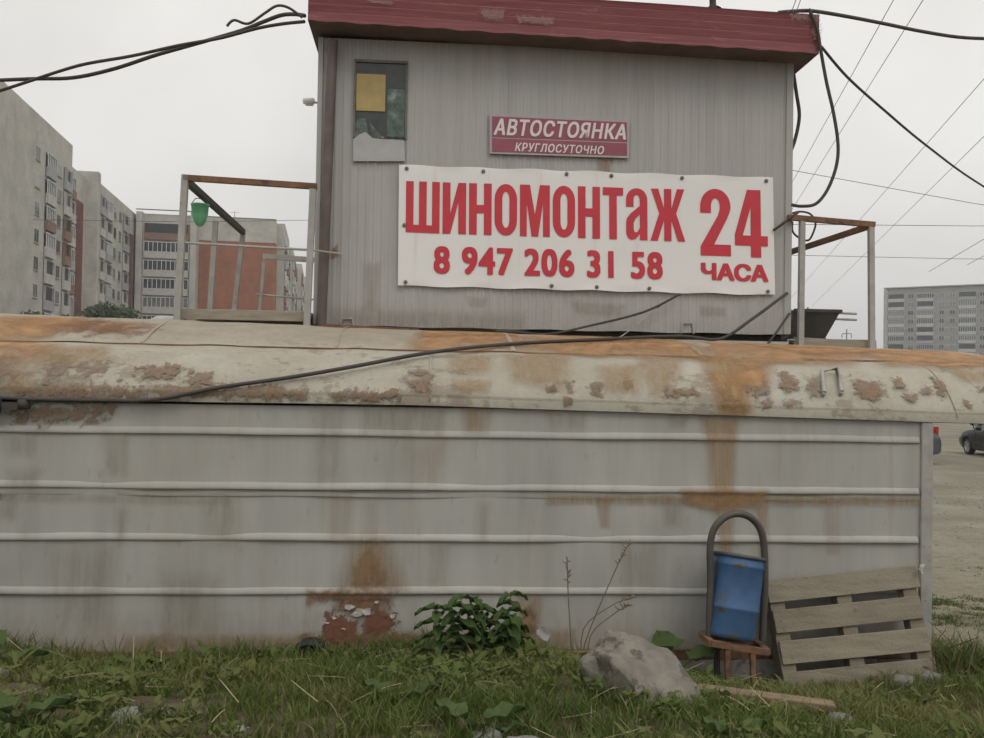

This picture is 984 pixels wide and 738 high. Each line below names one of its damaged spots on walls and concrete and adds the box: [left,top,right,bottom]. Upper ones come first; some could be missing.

rust [0,316,150,371]
rust [415,331,522,350]
peeling [7,353,315,428]
peeling [330,368,437,404]
peeling [545,380,604,407]
peeling [660,383,700,400]
peeling [717,368,826,410]
peeling [847,374,947,403]
rust [534,335,984,534]
rust [351,545,392,588]
peeling [302,590,414,645]